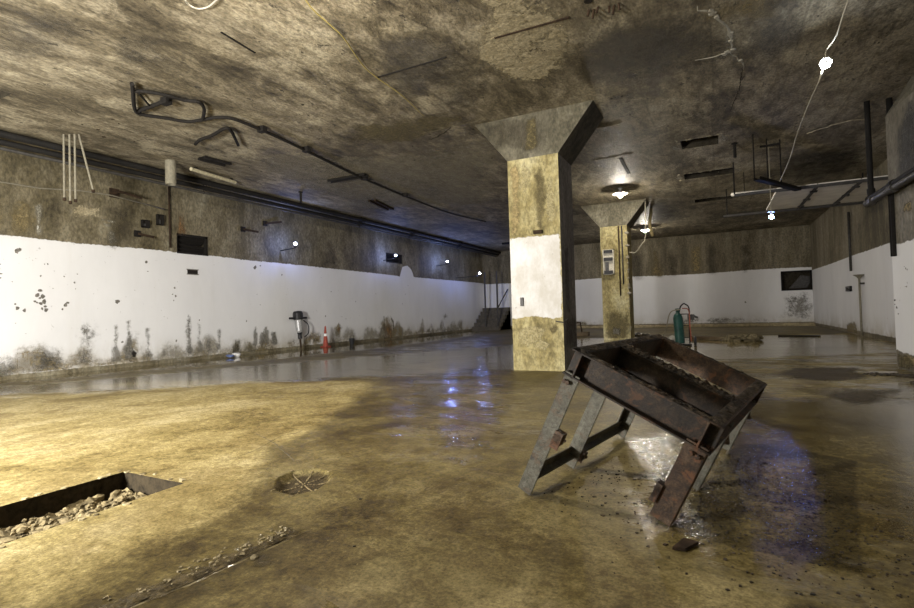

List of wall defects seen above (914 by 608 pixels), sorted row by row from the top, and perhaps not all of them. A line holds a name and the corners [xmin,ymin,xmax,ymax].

peeling [478,0,569,81]
crack [695,6,744,110]
water stain [788,295,810,318]
water stain [0,320,277,377]